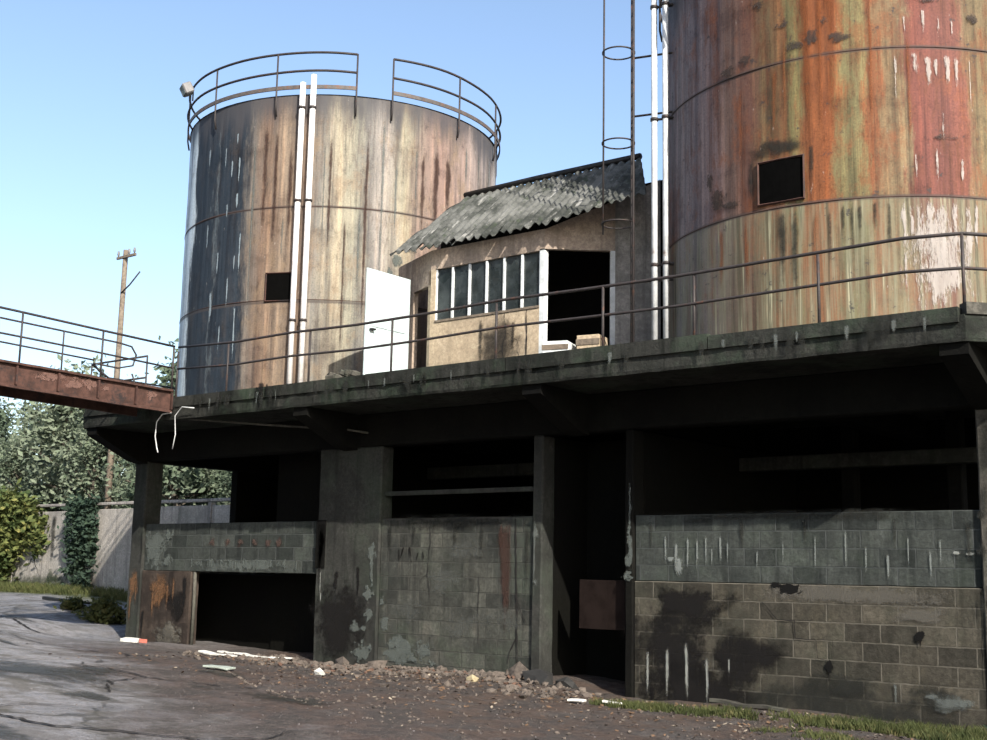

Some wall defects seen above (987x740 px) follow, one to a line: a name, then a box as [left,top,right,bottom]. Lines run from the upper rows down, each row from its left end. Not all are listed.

corrosion [262,134,279,227]
water stain [380,127,398,249]
corrosion [420,158,451,223]
corrosion [361,149,369,302]
peeling [901,204,978,303]
corrosion [32,372,110,391]
water stain [664,537,728,573]
water stain [696,509,896,564]
corrosion [150,574,174,614]